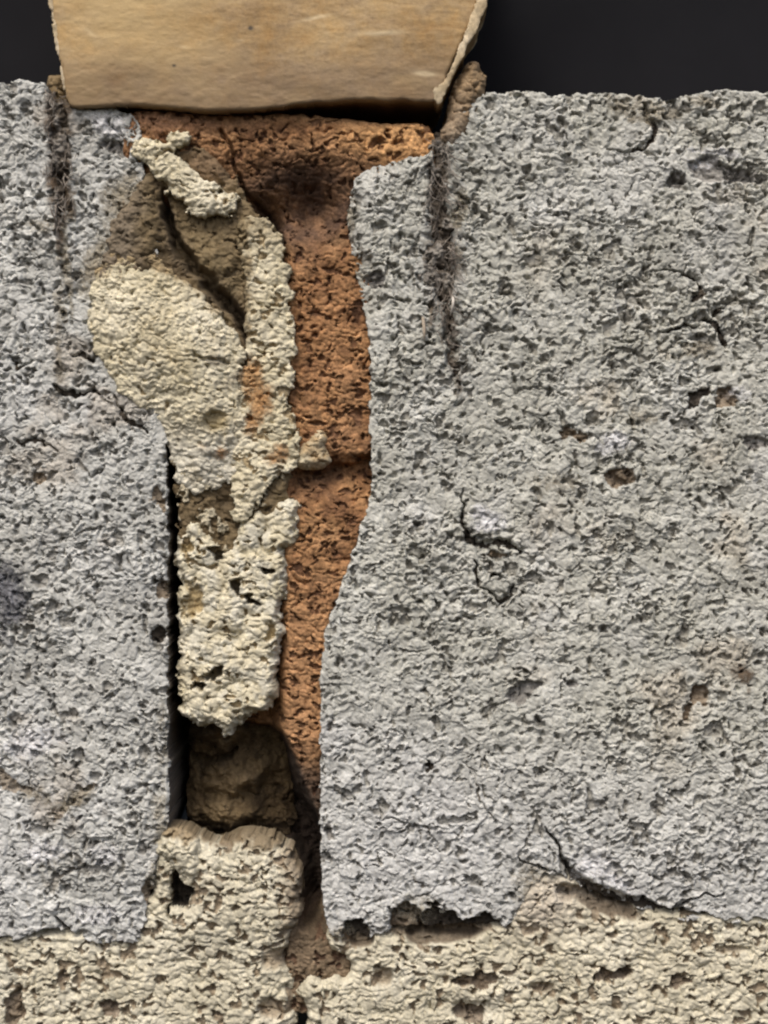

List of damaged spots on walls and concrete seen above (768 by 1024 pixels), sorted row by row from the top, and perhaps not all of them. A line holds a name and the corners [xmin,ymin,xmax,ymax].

crack [611,107,658,154]
crack [460,489,522,604]
spalling [150,625,168,643]
crack [525,830,722,918]
spalling [141,878,155,903]
spalling [162,870,195,918]
spalling [390,893,501,926]
spalling [343,918,370,937]
spalling [451,970,500,990]
spalling [593,960,637,982]
spalling [670,973,701,989]
spalling [452,999,489,1024]